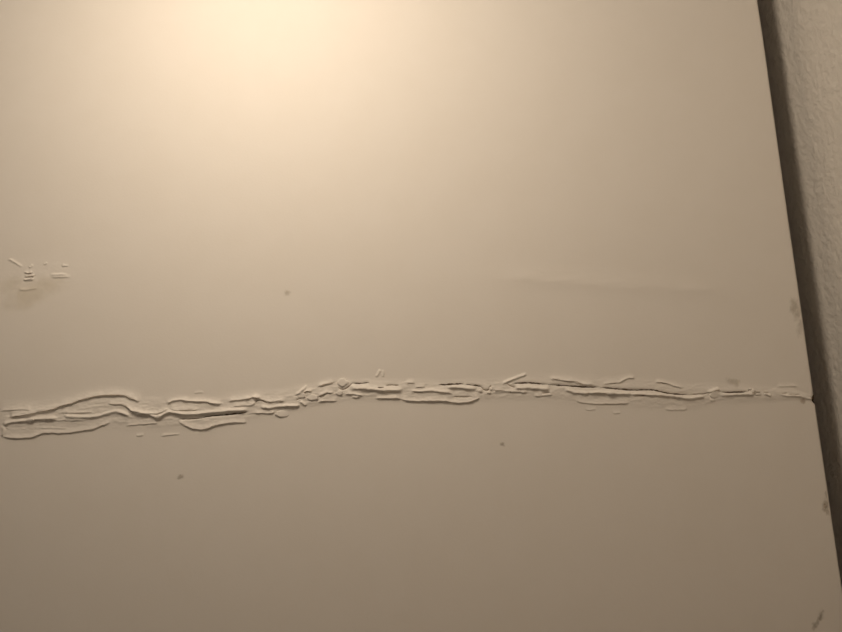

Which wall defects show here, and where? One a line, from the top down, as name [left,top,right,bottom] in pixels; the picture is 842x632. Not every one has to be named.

crack [0,369,812,441]